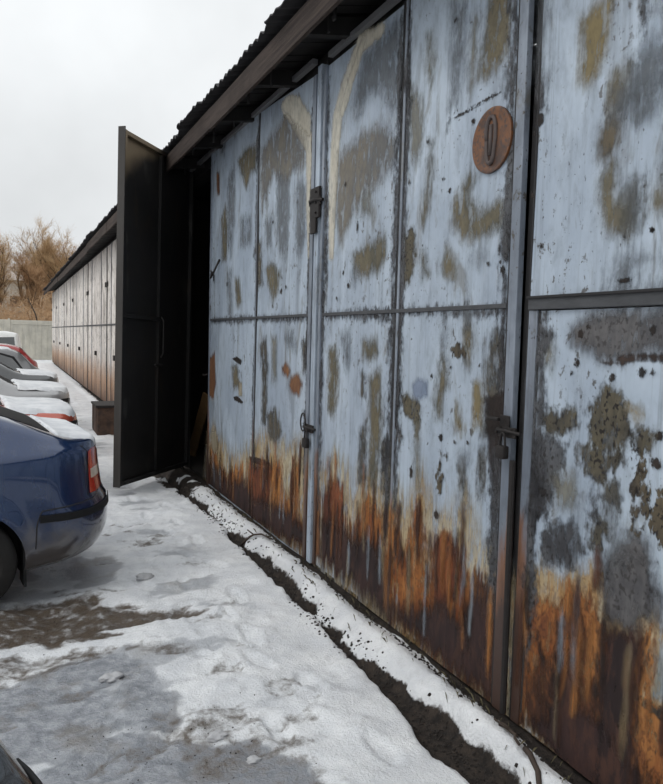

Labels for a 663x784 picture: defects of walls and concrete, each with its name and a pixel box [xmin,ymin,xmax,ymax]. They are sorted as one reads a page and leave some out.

corrosion [205,392,504,703]
peeling [542,406,577,436]
corrosion [505,434,663,784]
peeling [574,373,657,552]